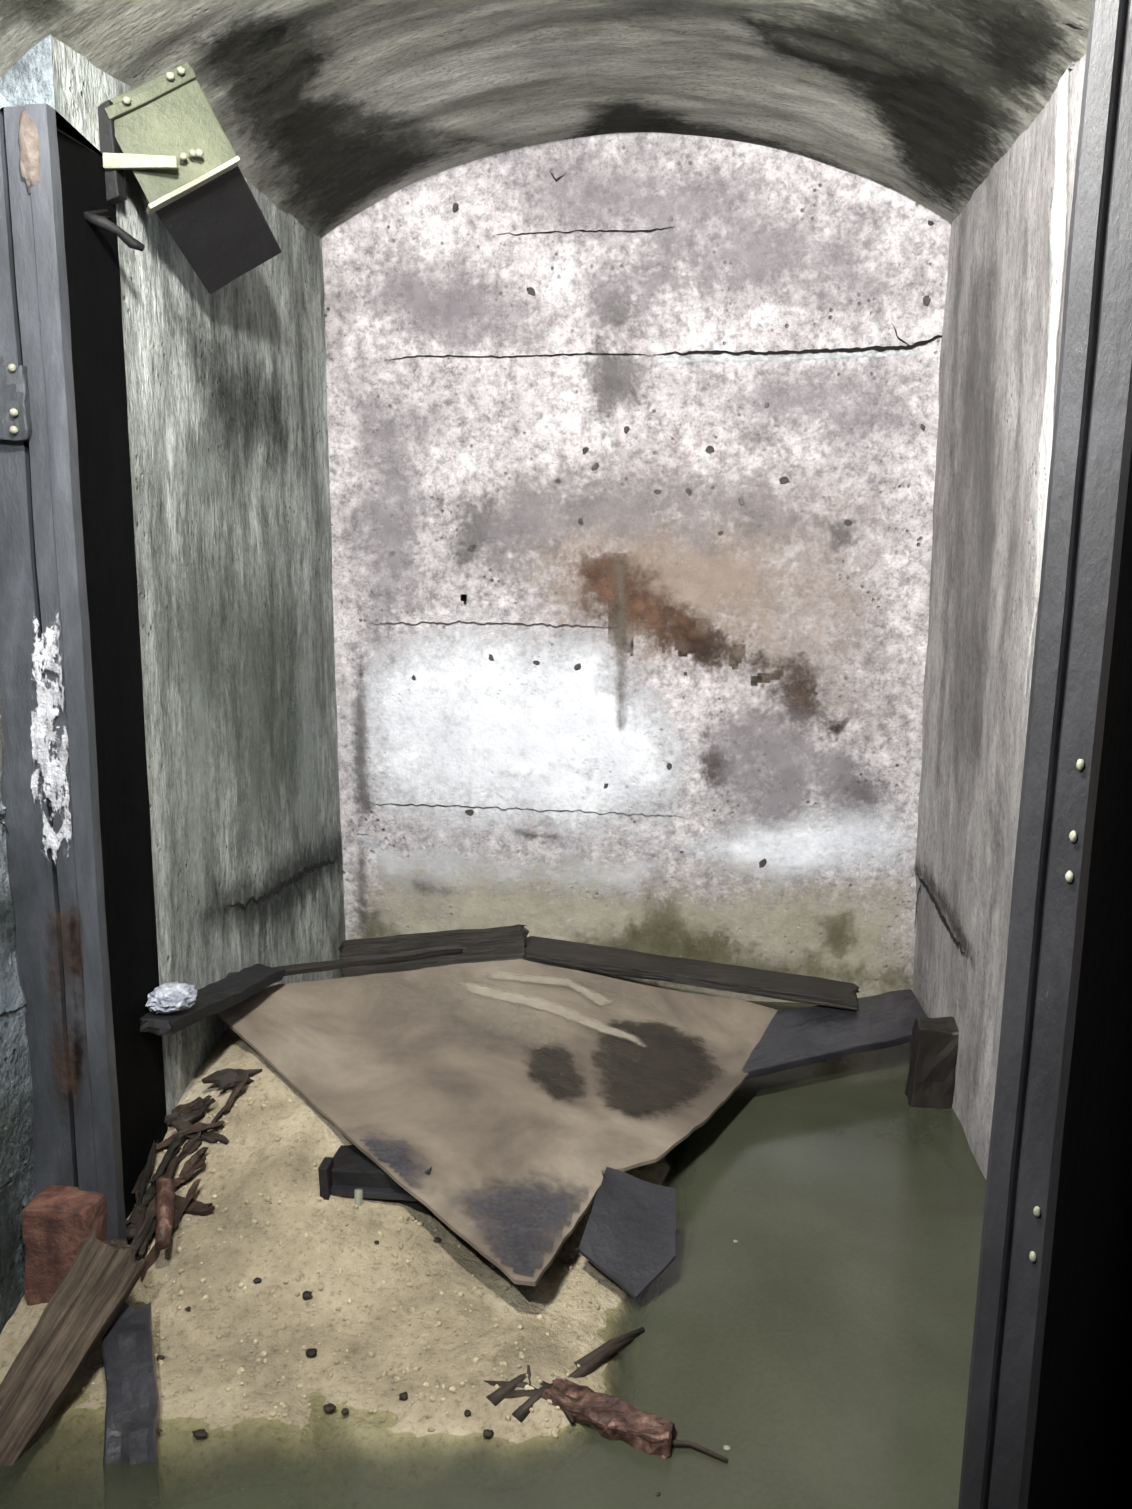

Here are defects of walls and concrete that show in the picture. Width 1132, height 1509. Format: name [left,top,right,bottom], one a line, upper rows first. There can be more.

damp [202,14,505,236]
damp [372,261,512,345]
damp [550,154,879,327]
damp [756,0,1068,690]
damp [363,406,425,600]
damp [457,497,648,565]
corrosion [579,543,758,686]
damp [355,629,908,1003]